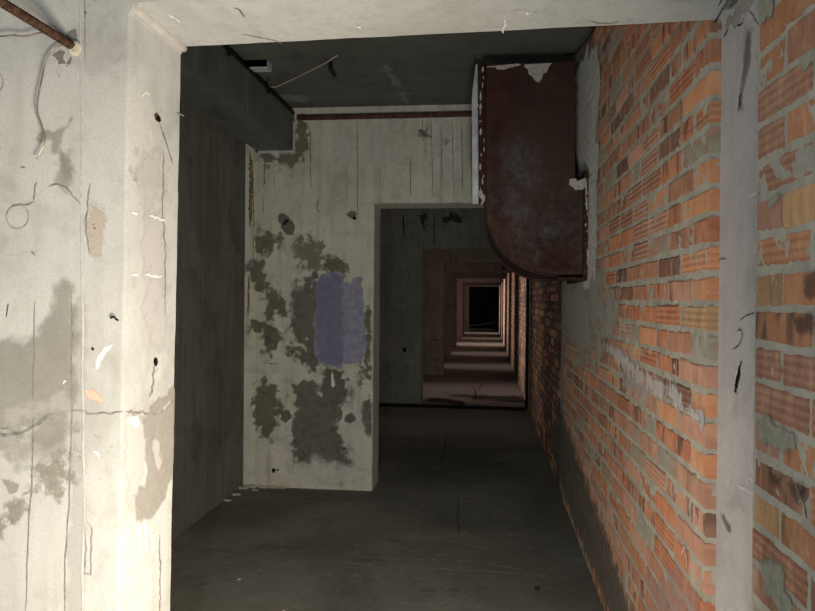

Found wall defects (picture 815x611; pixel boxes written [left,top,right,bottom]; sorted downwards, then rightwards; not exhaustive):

water stain [38,130,70,185]
water stain [0,281,75,458]
water stain [245,231,372,490]
crack [0,410,149,437]
crack [156,535,164,611]